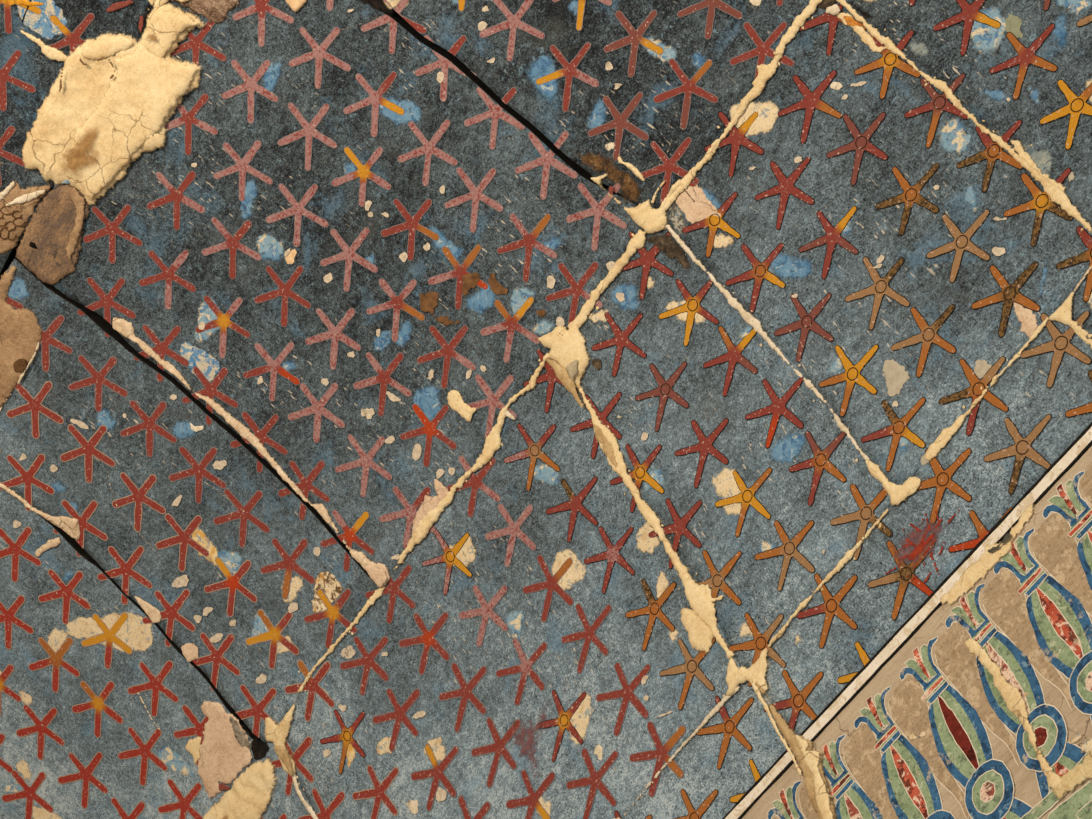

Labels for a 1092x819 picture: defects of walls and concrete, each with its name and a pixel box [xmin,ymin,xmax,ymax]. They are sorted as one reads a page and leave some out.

peeling [286,0,307,12]
crack [369,0,638,205]
spalling [0,179,90,407]
crack [559,0,1092,462]
spalling [0,483,80,557]
peeling [48,596,161,652]
crack [32,506,263,742]
spalling [181,643,199,662]
spalling [157,701,268,799]
crack [0,235,549,692]
crack [579,387,734,659]
crack [613,679,836,819]